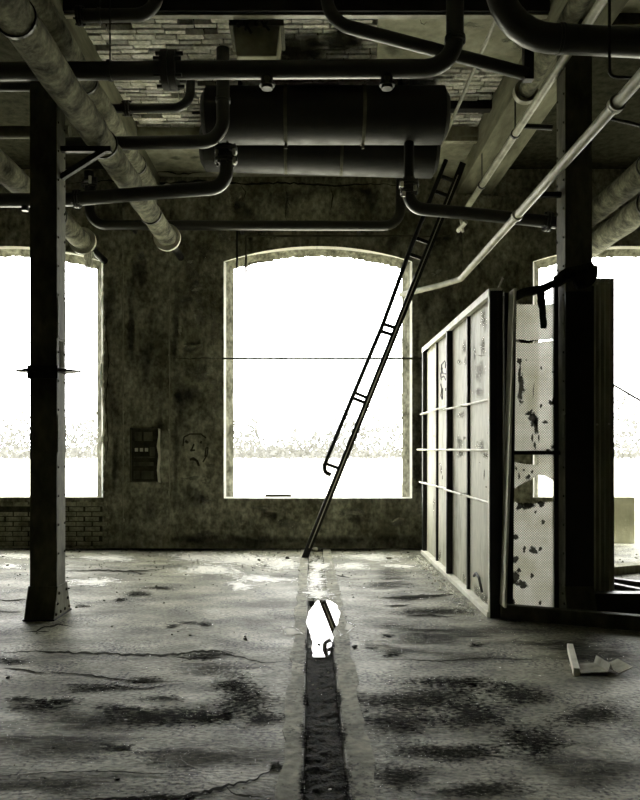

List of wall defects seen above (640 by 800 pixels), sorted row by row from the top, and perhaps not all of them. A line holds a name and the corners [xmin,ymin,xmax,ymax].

peeling [517,358,527,403]
peeling [525,397,554,450]
peeling [516,501,545,524]
peeling [513,546,542,589]
crack [0,650,281,690]
water stain [55,676,163,694]
water stain [393,676,511,689]
water stain [152,709,244,724]
water stain [387,740,520,764]
crack [0,769,190,777]
crack [67,762,283,800]
water stain [413,780,535,799]